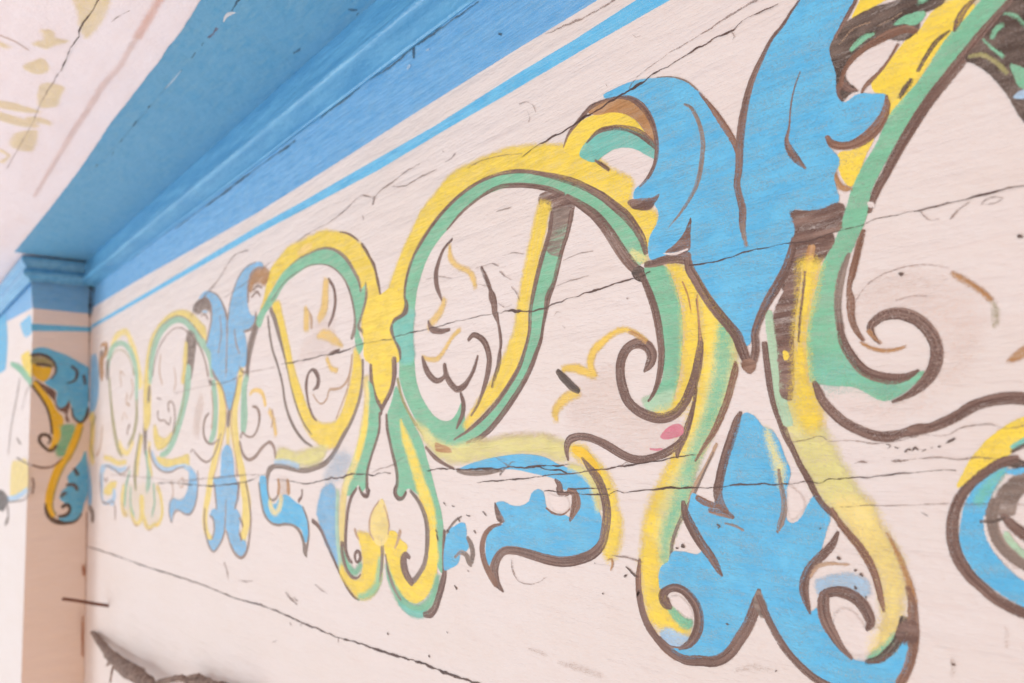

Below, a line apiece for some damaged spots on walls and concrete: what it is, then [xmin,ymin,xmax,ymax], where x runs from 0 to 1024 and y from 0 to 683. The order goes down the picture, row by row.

crack [8,0,129,166]
crack [689,185,1024,266]
crack [87,286,95,350]
crack [175,271,650,394]
crack [427,423,1024,496]
crack [85,512,479,683]